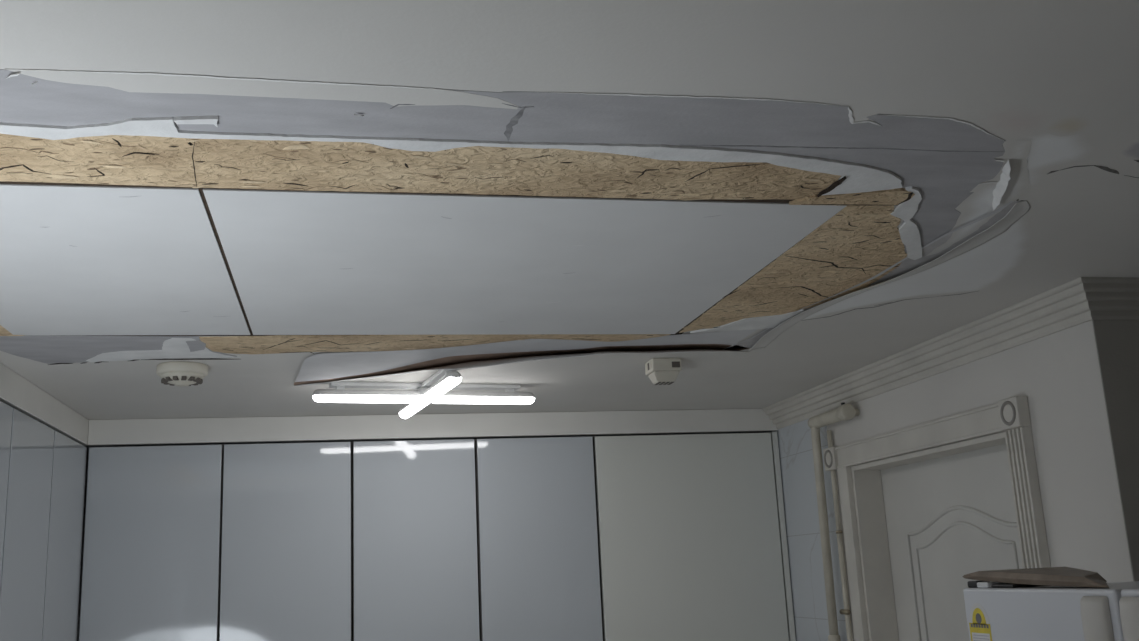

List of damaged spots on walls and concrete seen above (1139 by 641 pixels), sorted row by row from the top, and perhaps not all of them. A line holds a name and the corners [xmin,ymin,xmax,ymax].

peeling [800,132,1096,322]
crack [1048,160,1139,178]